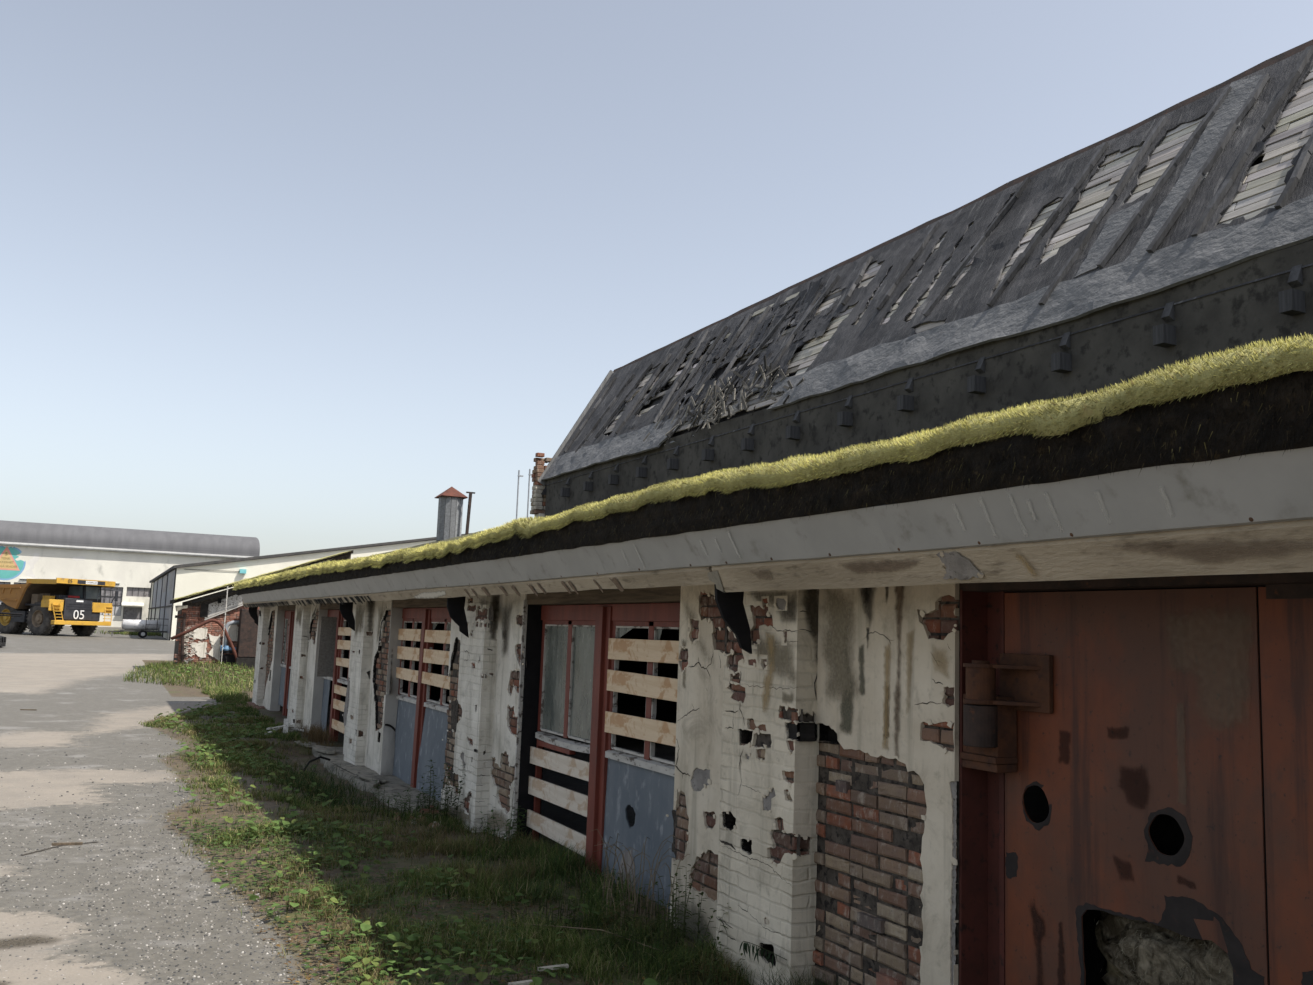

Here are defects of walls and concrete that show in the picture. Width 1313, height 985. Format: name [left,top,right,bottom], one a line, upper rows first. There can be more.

flaking render [342,611,392,744]
flaking render [442,598,493,813]
flaking render [506,644,527,737]
flaking render [679,590,787,703]
water stain [755,562,915,747]
flaking render [920,595,959,640]
flaking render [492,752,515,813]
flaking render [666,768,752,905]
flaking render [739,704,927,985]